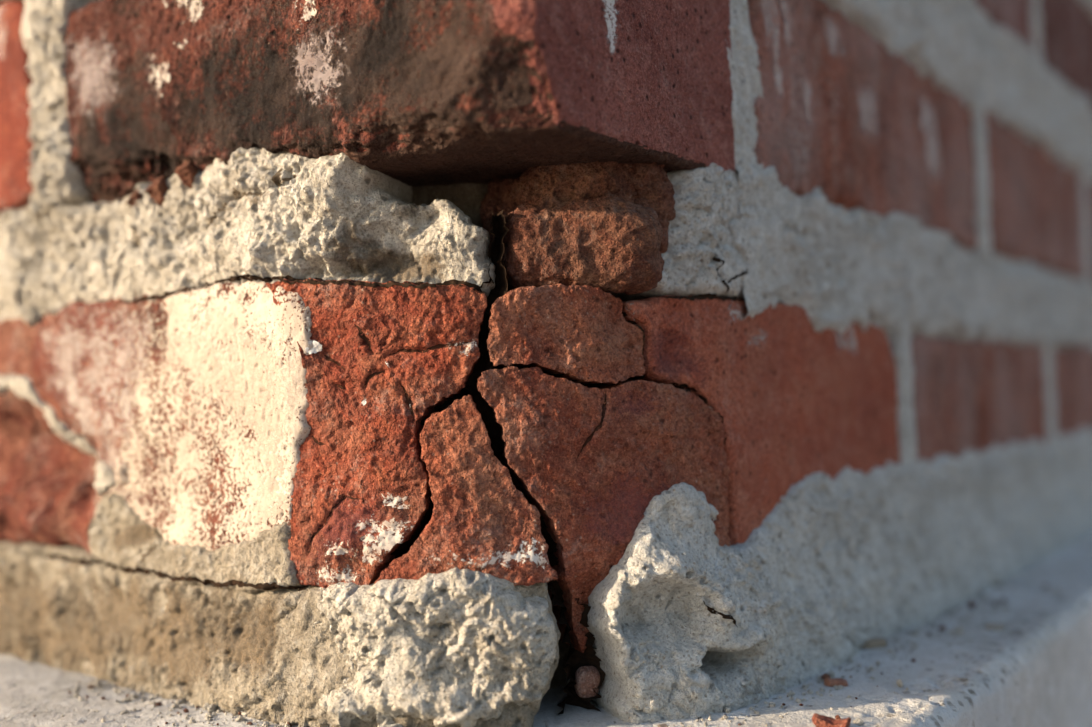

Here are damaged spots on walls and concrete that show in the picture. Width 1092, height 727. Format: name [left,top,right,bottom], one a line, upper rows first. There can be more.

crack [36,493,305,591]
water stain [316,493,415,586]
spalling [94,278,731,653]
crack [115,209,786,715]
water stain [429,538,548,569]
water stain [586,475,667,546]